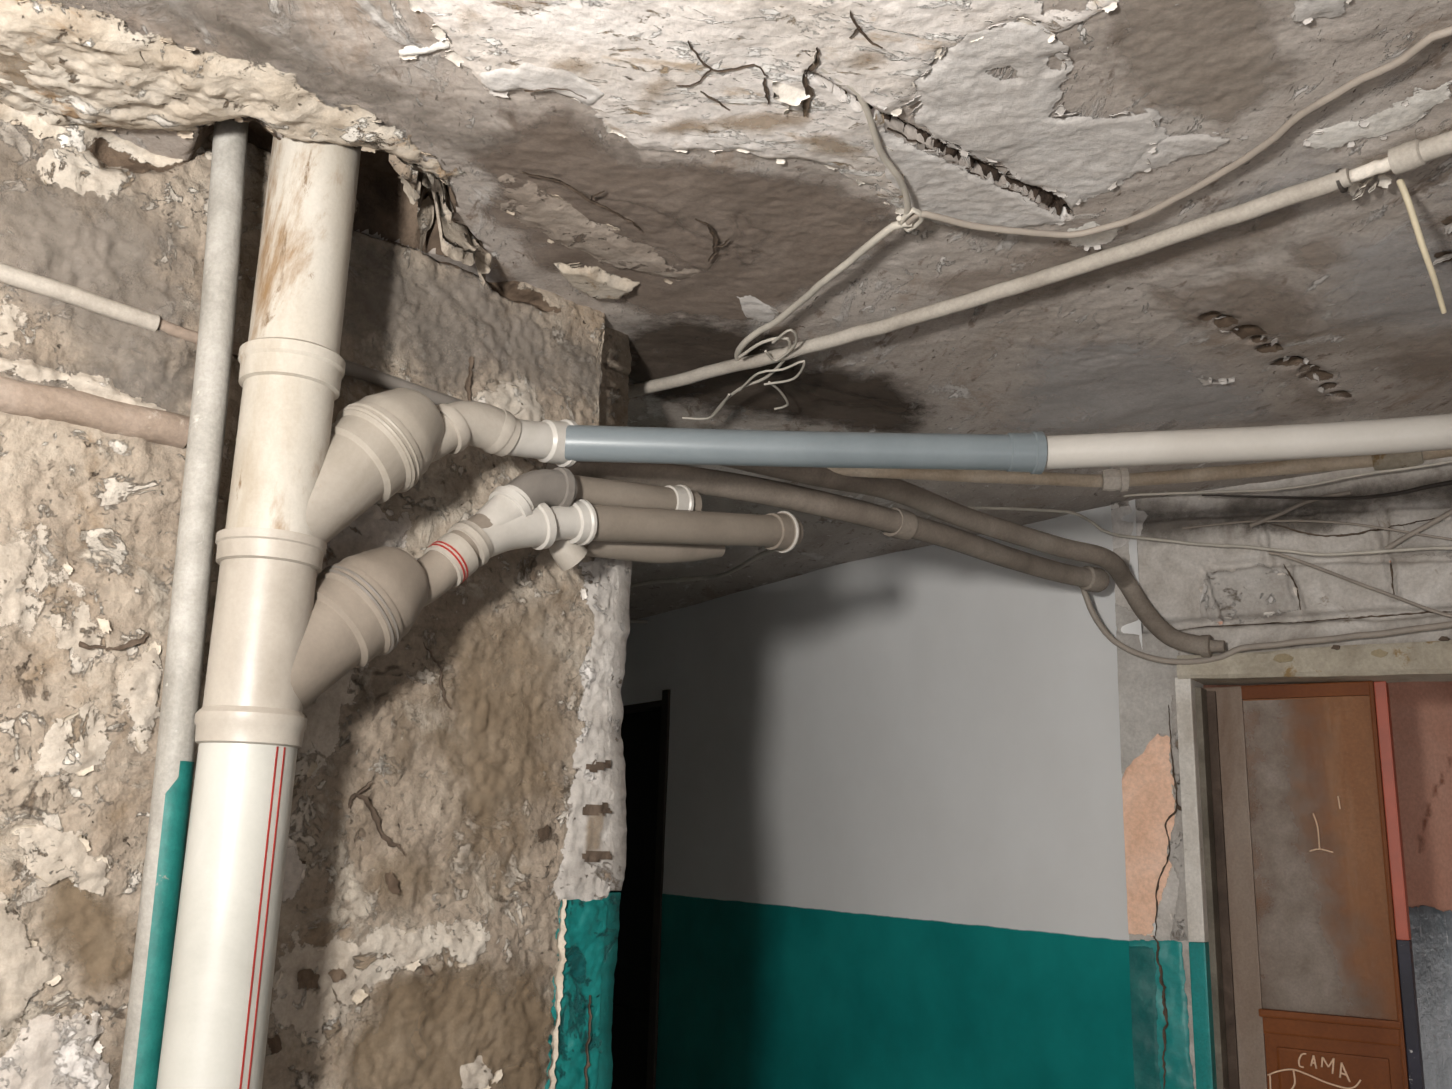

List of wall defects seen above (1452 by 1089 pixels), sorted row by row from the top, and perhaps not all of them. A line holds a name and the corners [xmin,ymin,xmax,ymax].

flaking render [0,0,492,286]
leakage [152,0,402,105]
crack [676,10,1071,216]
leakage [1115,0,1291,178]
flaking render [0,358,166,411]
leakage [409,112,923,432]
spalling [1198,311,1352,398]
peeling [96,618,112,634]
flaking render [0,892,112,1089]
flaking render [8,823,120,900]
peeling [1115,604,1179,1089]
crack [1153,705,1182,1089]